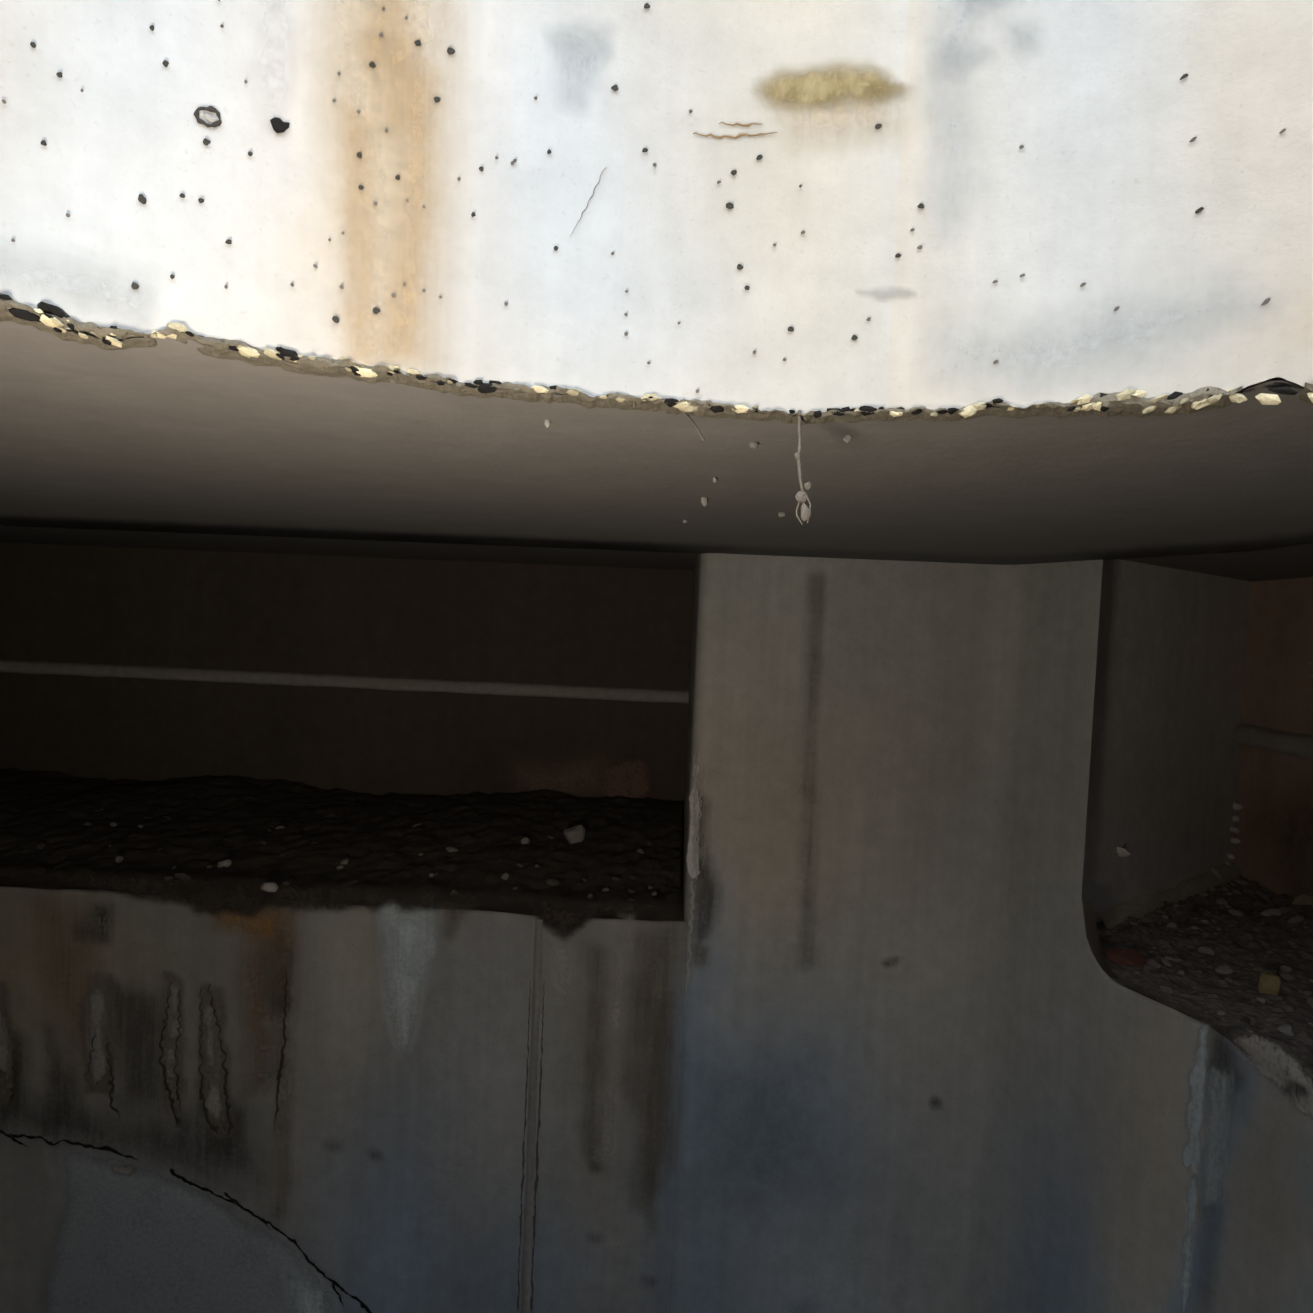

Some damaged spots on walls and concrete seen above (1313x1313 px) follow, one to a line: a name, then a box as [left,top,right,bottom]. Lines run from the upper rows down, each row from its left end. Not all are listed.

corrosion [346,0,423,353]
spalling [0,293,1313,425]
crack [0,1130,138,1160]
crack [170,1169,372,1313]